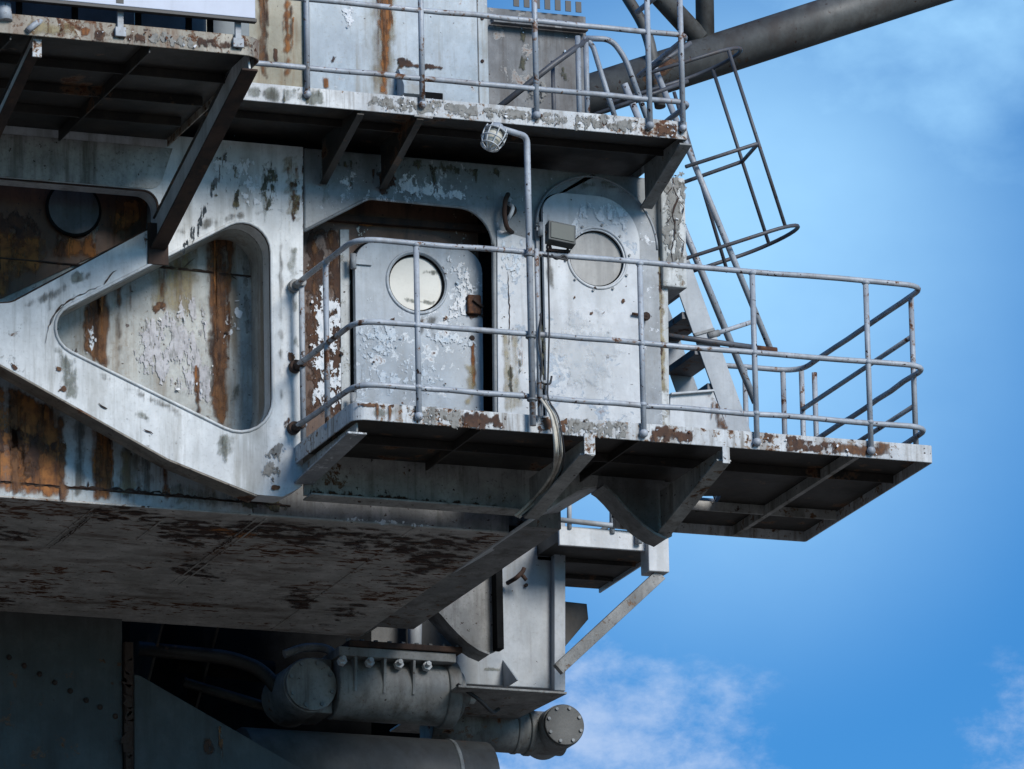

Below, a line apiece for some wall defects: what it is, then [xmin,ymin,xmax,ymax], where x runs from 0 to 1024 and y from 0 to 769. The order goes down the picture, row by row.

corrosion [368,0,482,118]
peeling [483,107,639,134]
peeling [179,135,260,264]
crack [667,179,684,261]
corrosion [83,286,131,367]
peeling [134,296,213,402]
corrosion [193,240,234,424]
corrosion [286,157,341,416]
peeling [310,285,349,408]
peeling [427,252,478,348]
corrosion [0,387,69,500]
corrosion [761,433,890,456]